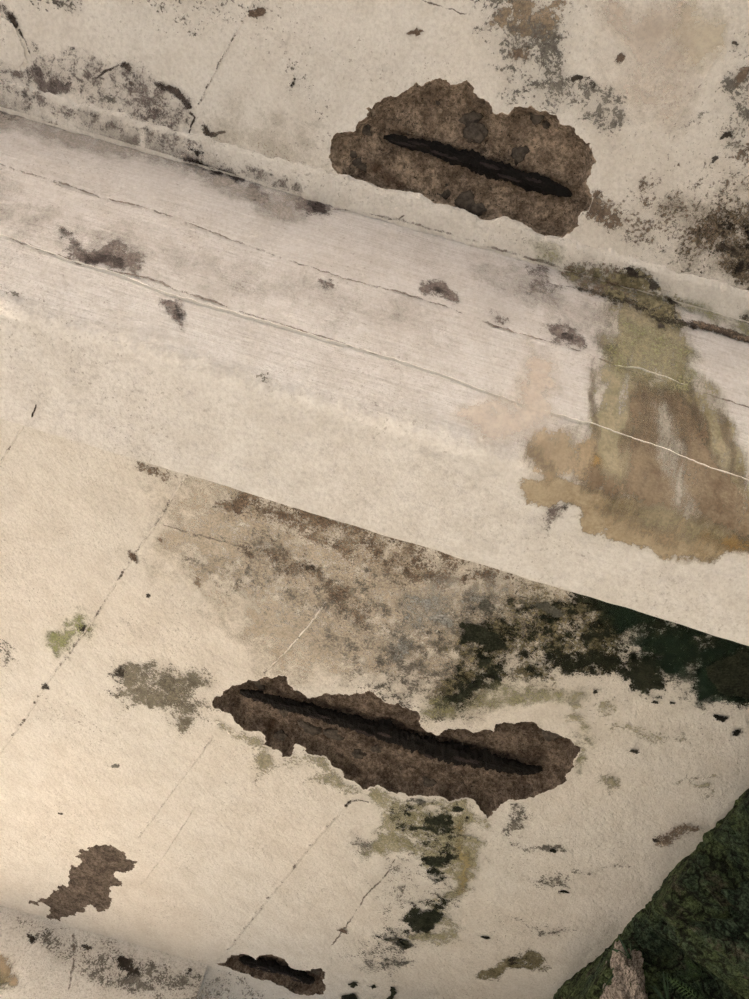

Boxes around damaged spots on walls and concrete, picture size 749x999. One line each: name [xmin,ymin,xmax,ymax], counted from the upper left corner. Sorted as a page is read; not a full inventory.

crack [0,4,30,53]
spalling [329,78,596,238]
leakage [582,9,749,290]
leakage [520,245,749,563]
leakage [183,491,630,729]
leakage [108,659,221,738]
spalling [212,675,580,818]
peeling [29,844,137,921]
spalling [216,954,326,996]
leakage [337,788,491,982]
leakage [475,915,576,981]
leakage [501,803,567,853]